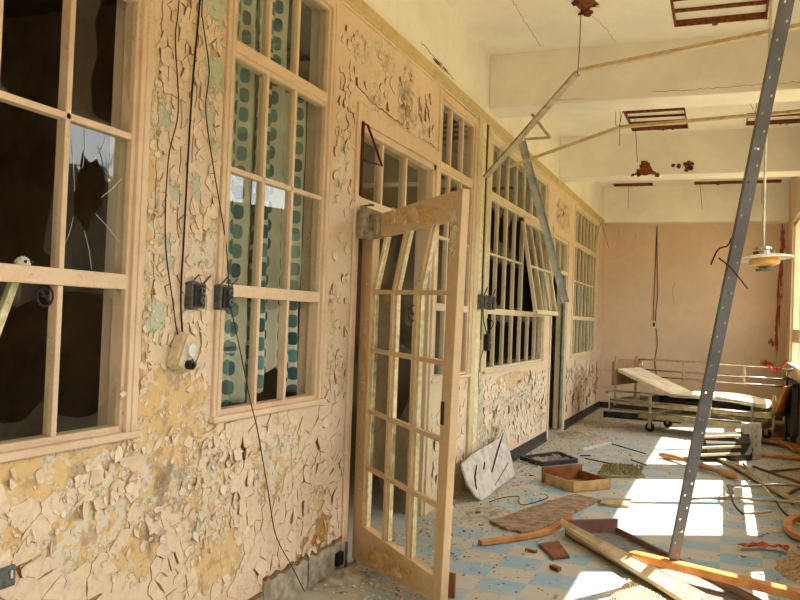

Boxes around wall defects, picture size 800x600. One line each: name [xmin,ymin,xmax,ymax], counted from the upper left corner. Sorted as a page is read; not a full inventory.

corrosion [670,0,770,27]
peeling [201,0,229,155]
peeling [354,30,431,143]
corrosion [623,108,689,131]
peeling [0,31,307,600]
corrosion [775,224,785,352]
peeling [476,371,542,446]
peeling [569,363,598,399]
flaking render [248,485,342,600]